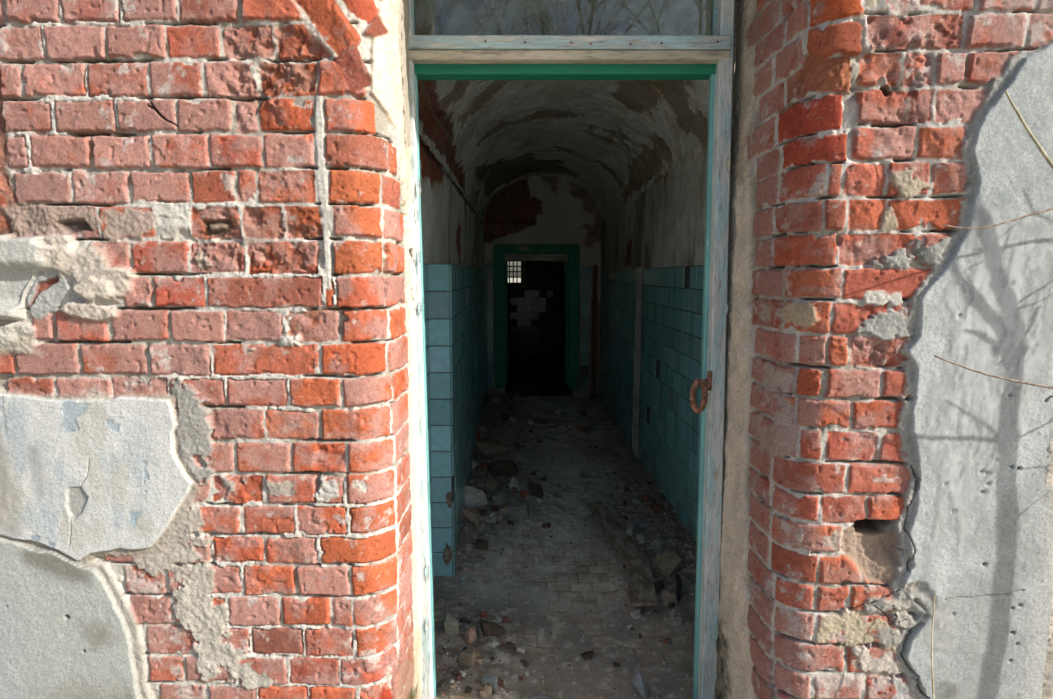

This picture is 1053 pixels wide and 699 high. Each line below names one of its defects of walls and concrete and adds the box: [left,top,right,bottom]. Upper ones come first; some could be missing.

flaking render [521,16,611,35]
spalling [222,22,333,119]
spalling [797,51,855,94]
spalling [867,14,962,126]
spalling [0,70,98,239]
flaking render [415,80,466,222]
spalling [186,207,324,274]
flaking render [483,177,543,242]
spalling [851,340,893,367]
flaking render [0,392,194,560]
spalling [840,519,900,585]
spalling [378,684,396,699]